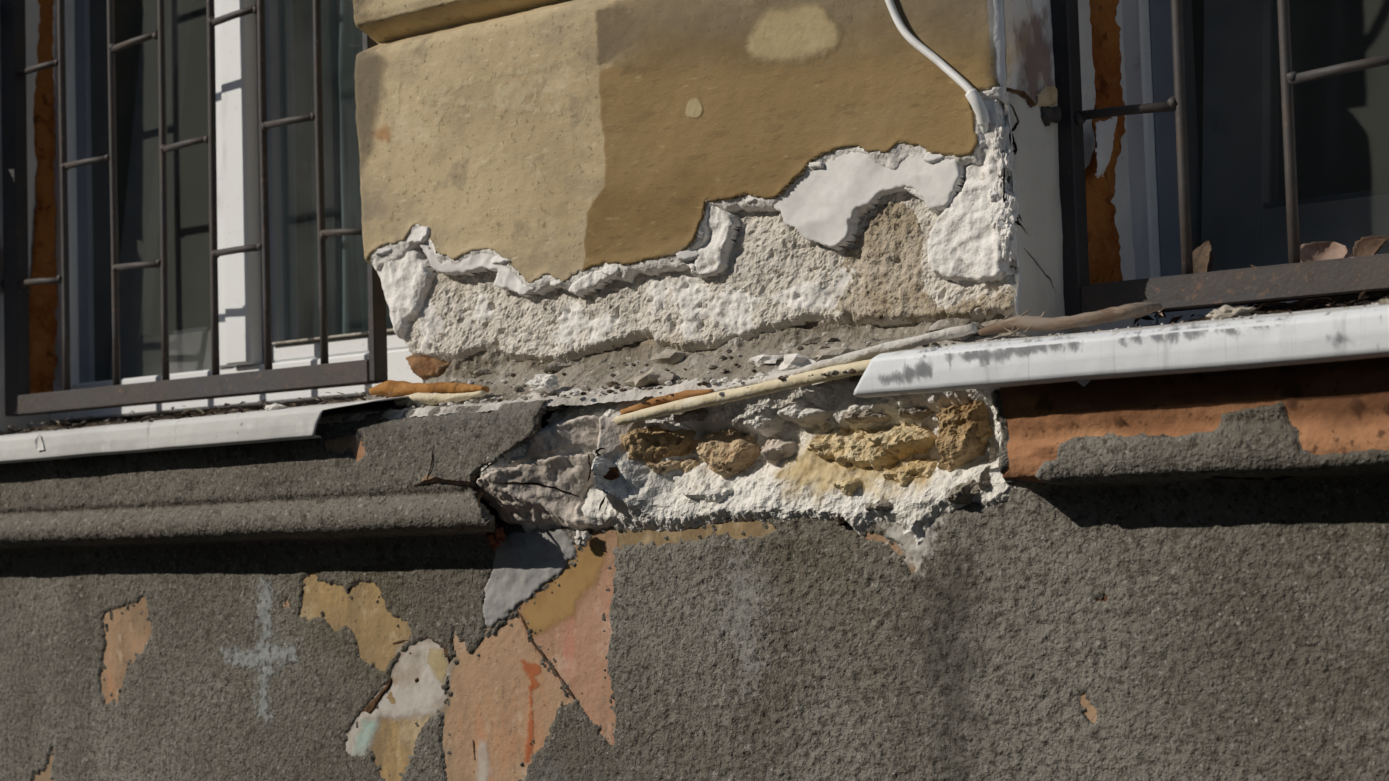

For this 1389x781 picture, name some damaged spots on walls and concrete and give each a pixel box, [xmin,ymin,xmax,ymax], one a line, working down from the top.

spalling [370,85,1081,387]
peeling [1000,357,1389,483]
peeling [101,597,152,704]
peeling [283,415,776,781]
peeling [34,748,55,781]